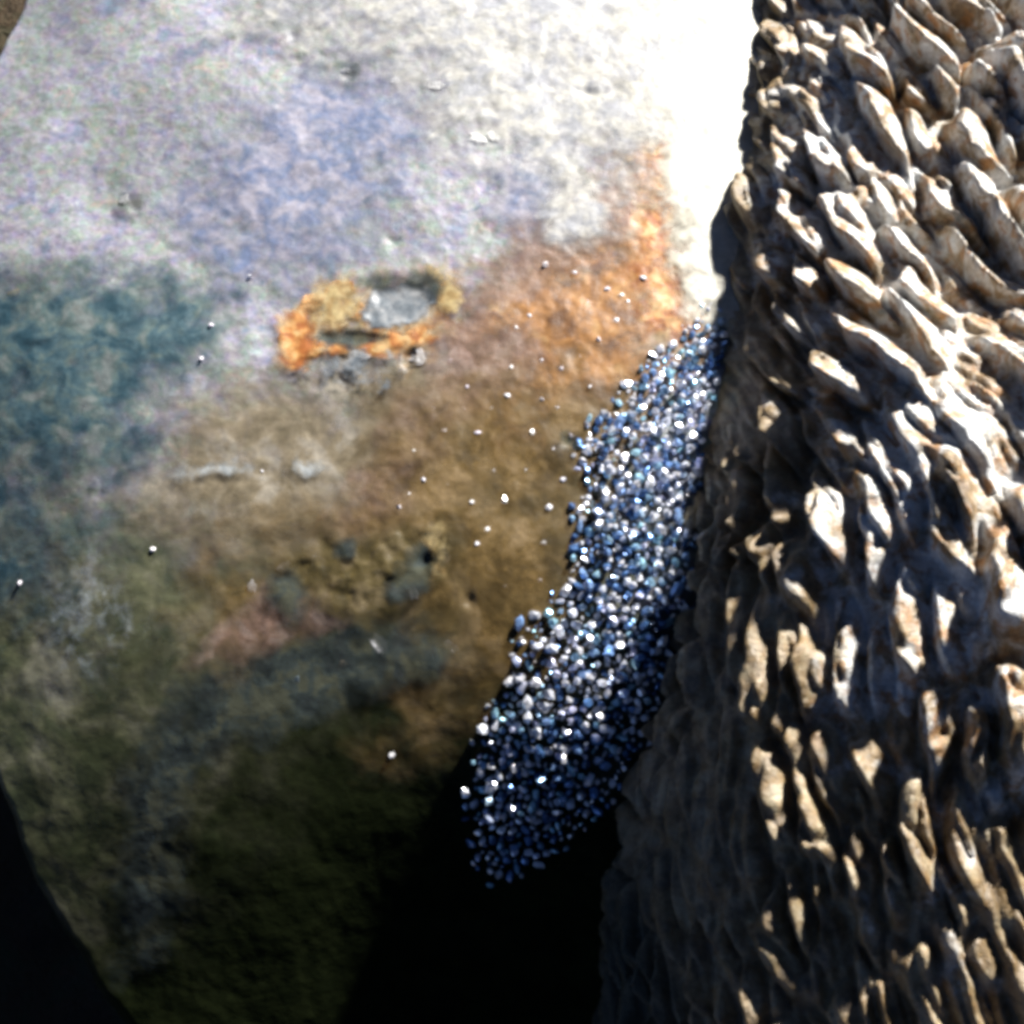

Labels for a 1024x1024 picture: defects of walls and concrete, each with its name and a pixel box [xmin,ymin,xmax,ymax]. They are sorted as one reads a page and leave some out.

damp [0,259,224,606]
damp [201,464,235,474]
spalling [277,265,462,383]
peeling [243,0,770,329]
rust [337,139,718,676]